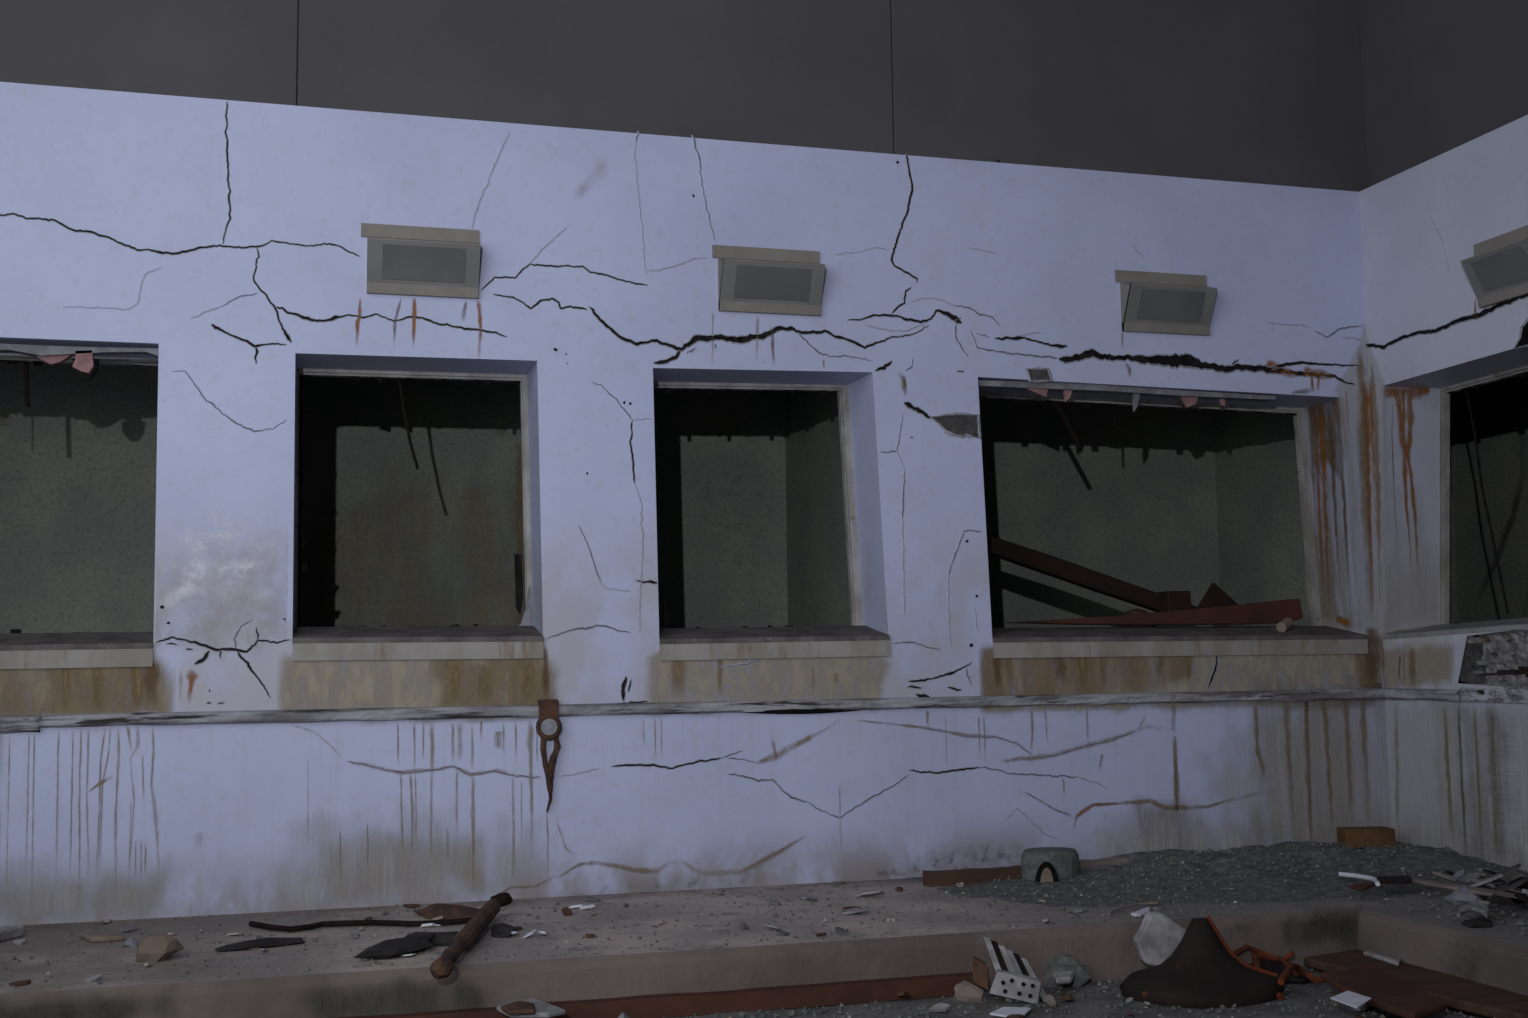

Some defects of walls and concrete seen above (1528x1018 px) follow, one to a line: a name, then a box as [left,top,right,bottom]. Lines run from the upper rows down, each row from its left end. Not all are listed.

crack [0,101,1528,840]
rust [1267,330,1451,689]
damp [0,658,171,853]
damp [281,652,553,817]
damp [651,655,886,702]
damp [978,650,1378,745]
damp [1385,706,1528,870]
spalling [1458,630,1528,703]